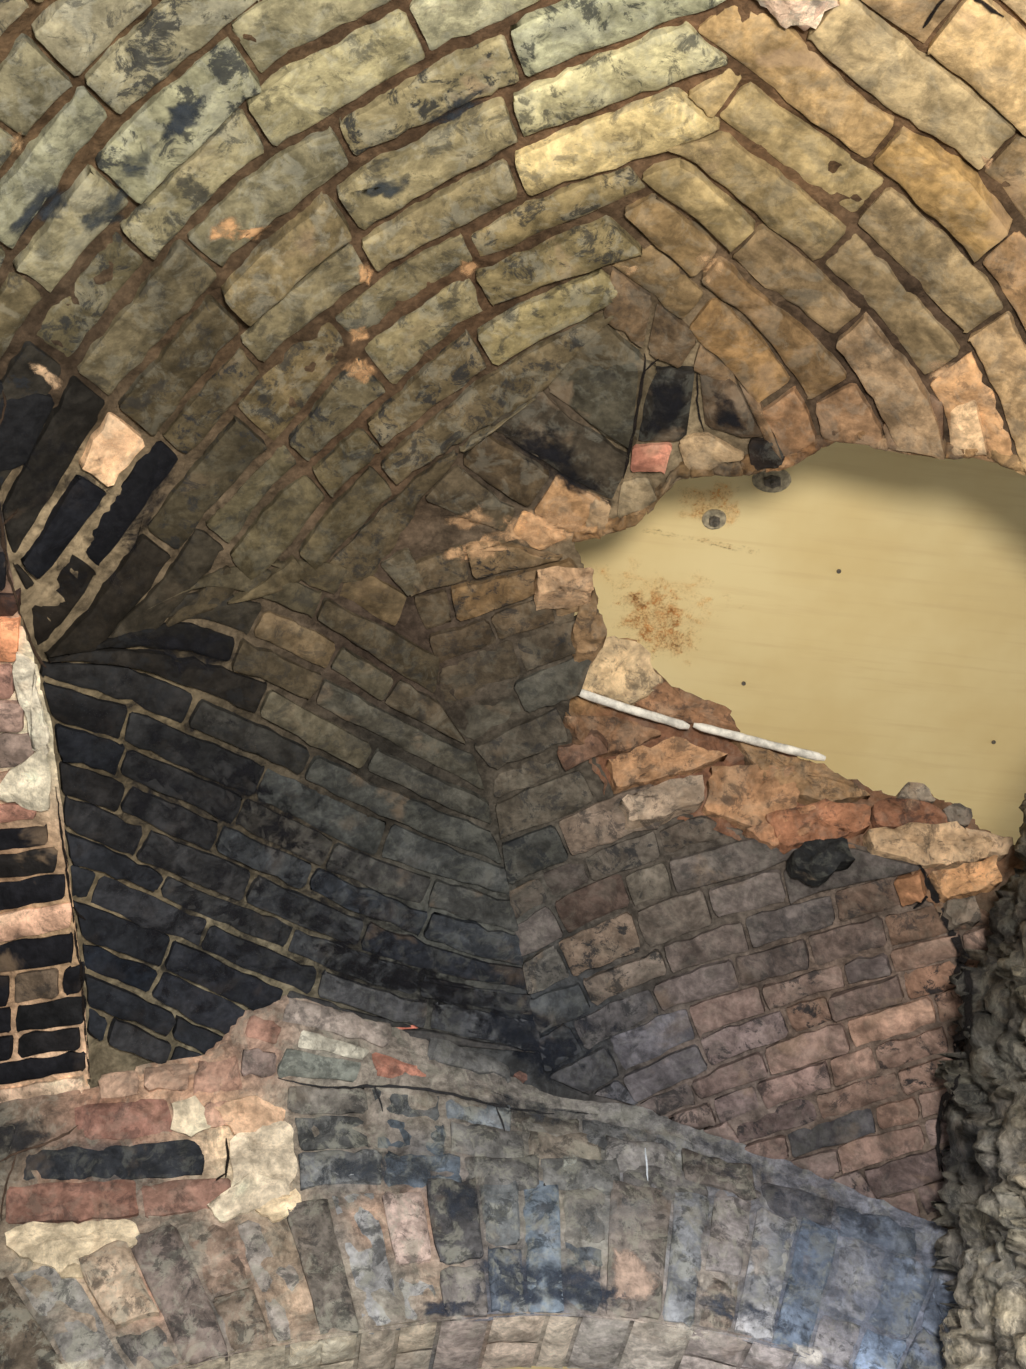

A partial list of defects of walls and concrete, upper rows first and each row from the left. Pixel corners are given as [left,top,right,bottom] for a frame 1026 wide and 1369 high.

spalling [446,430,1026,560]
spalling [534,566,1026,934]